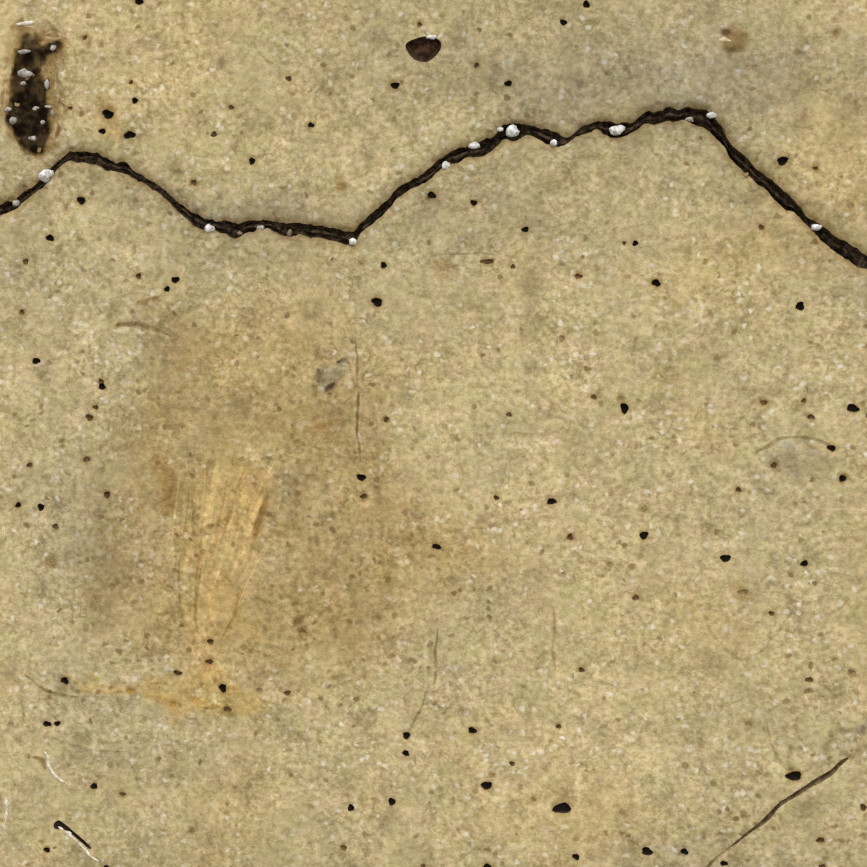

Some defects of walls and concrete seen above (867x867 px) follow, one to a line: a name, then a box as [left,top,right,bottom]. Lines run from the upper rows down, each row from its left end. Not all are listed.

crack [0,107,867,270]